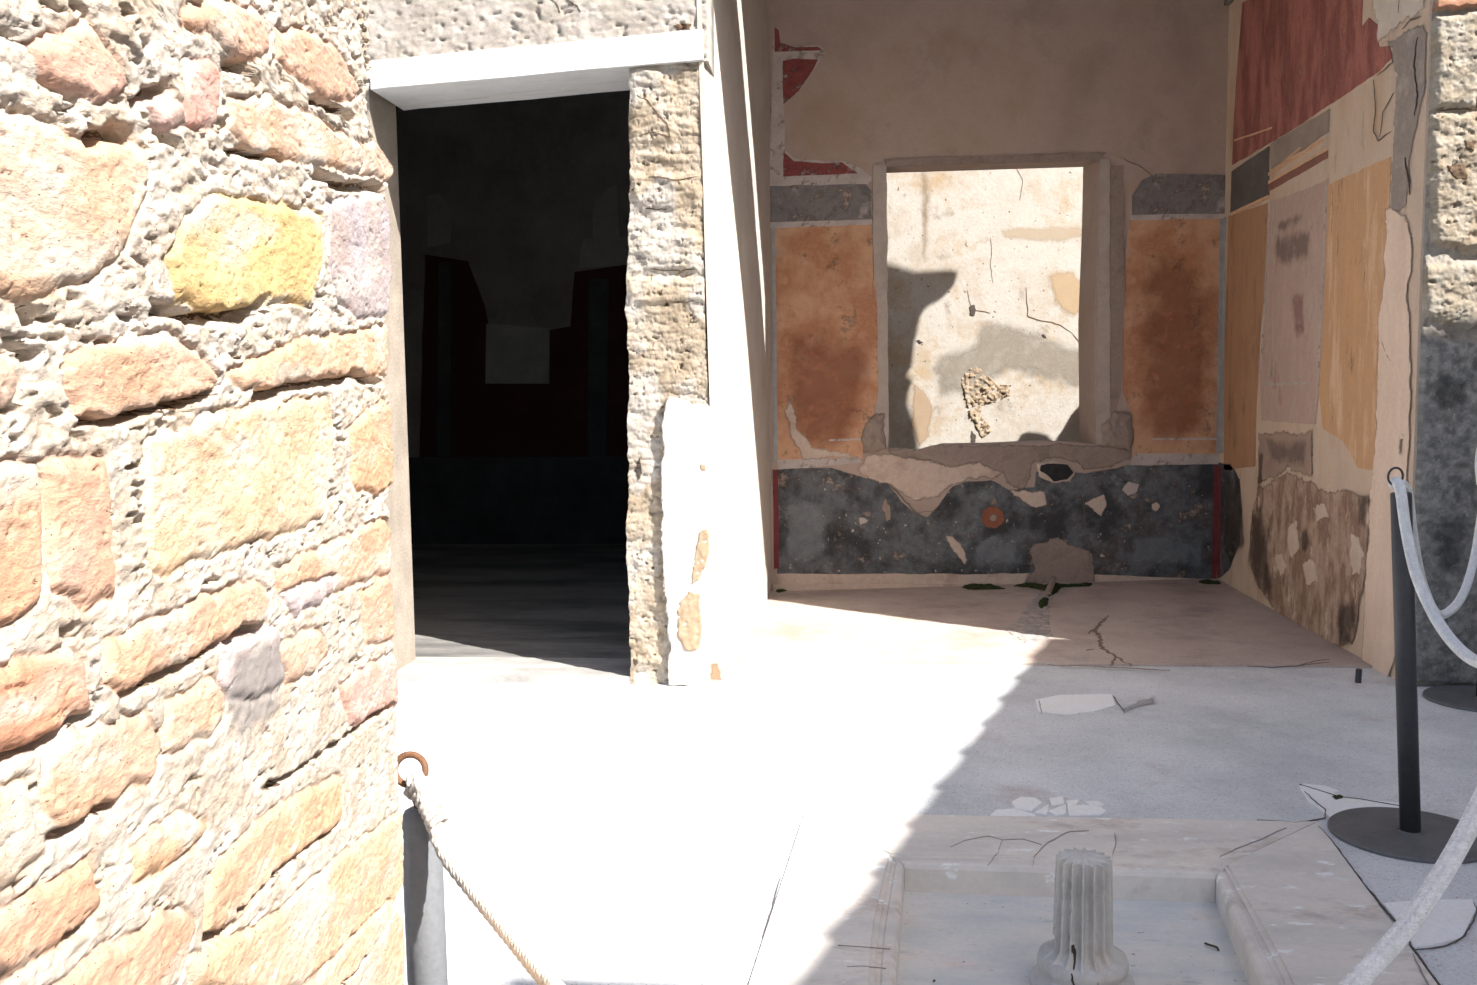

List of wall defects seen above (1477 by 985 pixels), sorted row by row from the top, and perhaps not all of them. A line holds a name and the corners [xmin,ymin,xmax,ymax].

flaking render [1373,0,1427,211]
flaking render [785,325,1134,489]
flaking render [859,498,891,525]
flaking render [1085,495,1106,516]
spalling [1122,482,1139,496]
peeling [1250,431,1369,646]
crack [1005,591,1170,711]
crack [951,830,1116,867]
crack [1069,944,1077,985]